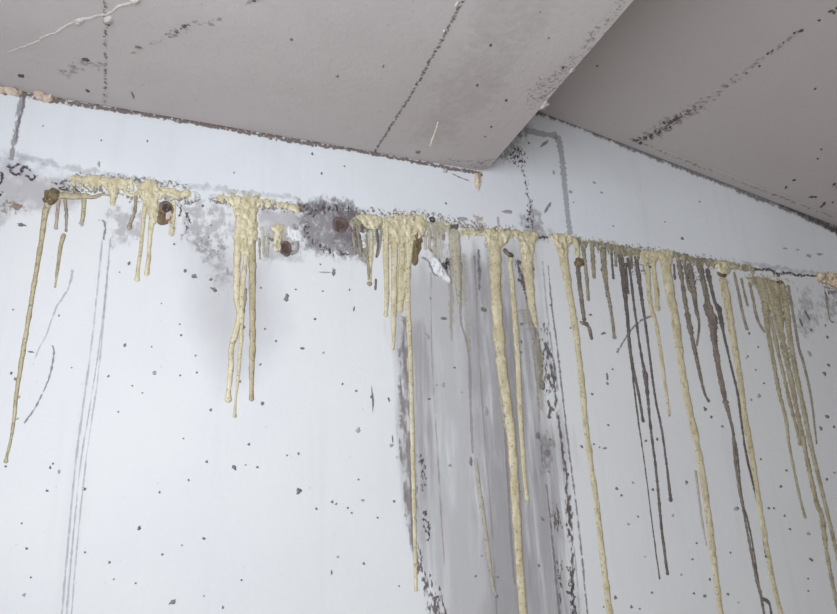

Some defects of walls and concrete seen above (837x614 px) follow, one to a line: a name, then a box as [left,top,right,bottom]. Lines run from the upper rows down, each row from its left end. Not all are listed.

damp [3,182,116,463]
damp [123,188,154,282]
damp [224,215,279,418]
damp [294,198,462,614]
damp [478,238,577,614]
damp [556,236,837,614]